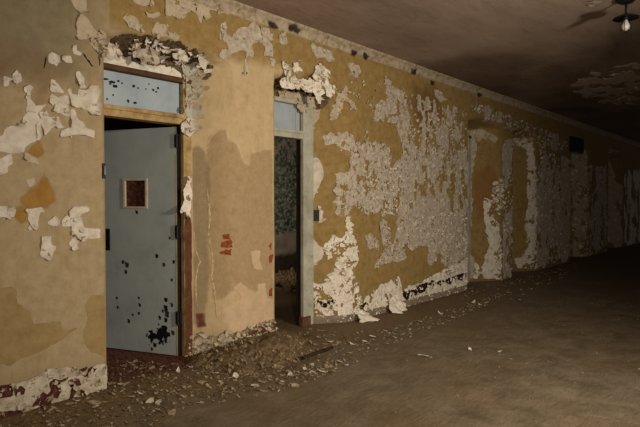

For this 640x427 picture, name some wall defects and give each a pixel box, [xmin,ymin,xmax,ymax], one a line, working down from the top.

peeling [48,0,235,137]
peeling [0,70,123,176]
peeling [219,19,640,322]
peeling [0,206,16,220]
peeling [25,207,45,230]
peeling [40,236,56,261]
peeling [47,206,100,251]
spalling [0,287,107,418]
peeling [188,282,278,356]